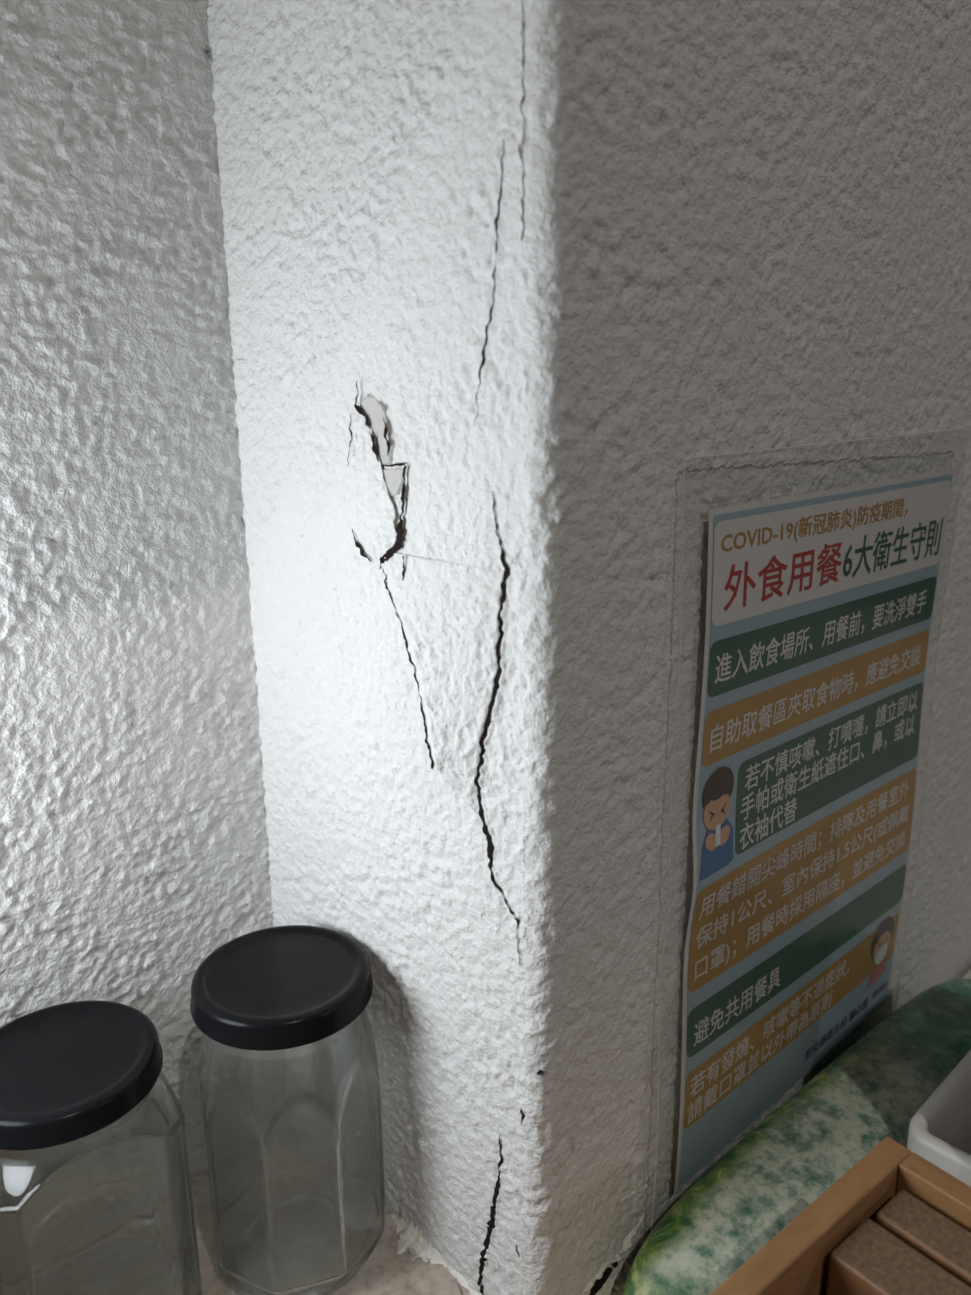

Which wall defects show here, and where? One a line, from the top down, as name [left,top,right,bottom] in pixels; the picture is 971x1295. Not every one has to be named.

peeling [347,382,407,569]
crack [474,491,521,965]
spalling [391,1213,482,1295]
crack [477,1108,525,1295]
spalling [582,1215,645,1295]